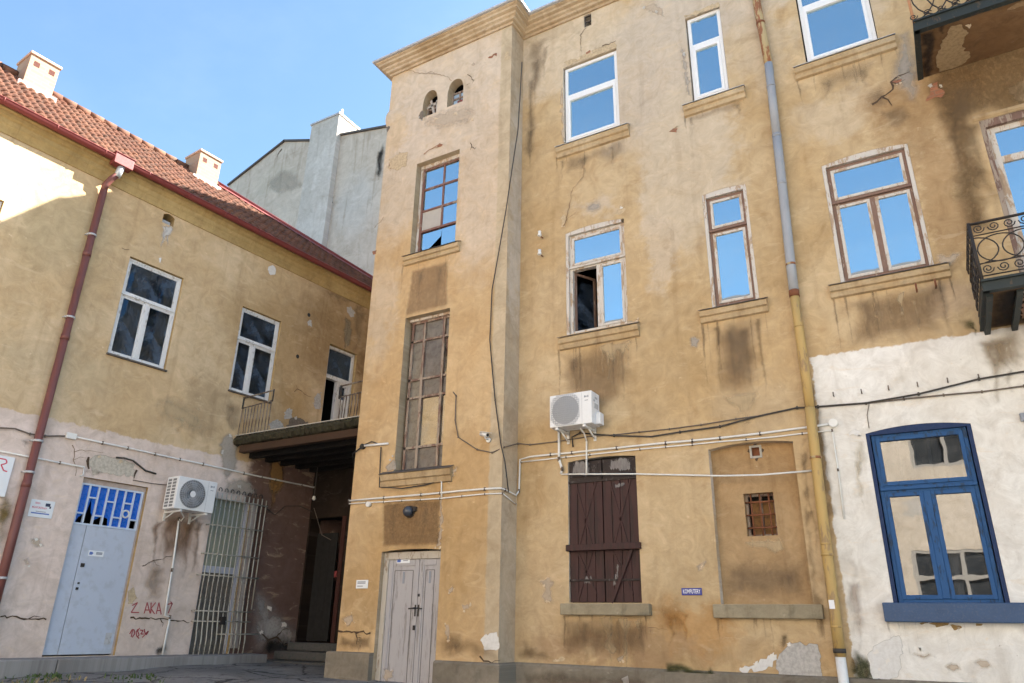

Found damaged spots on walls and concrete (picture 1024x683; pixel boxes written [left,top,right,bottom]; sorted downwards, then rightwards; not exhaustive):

spalling [926,24,971,101]
crack [871,71,910,106]
damp [922,26,1024,226]
damp [574,341,629,397]
crack [72,445,102,476]
crack [0,613,46,621]
crack [130,616,189,627]
crack [338,630,371,644]
peeling [739,653,777,673]
peeling [867,636,903,679]